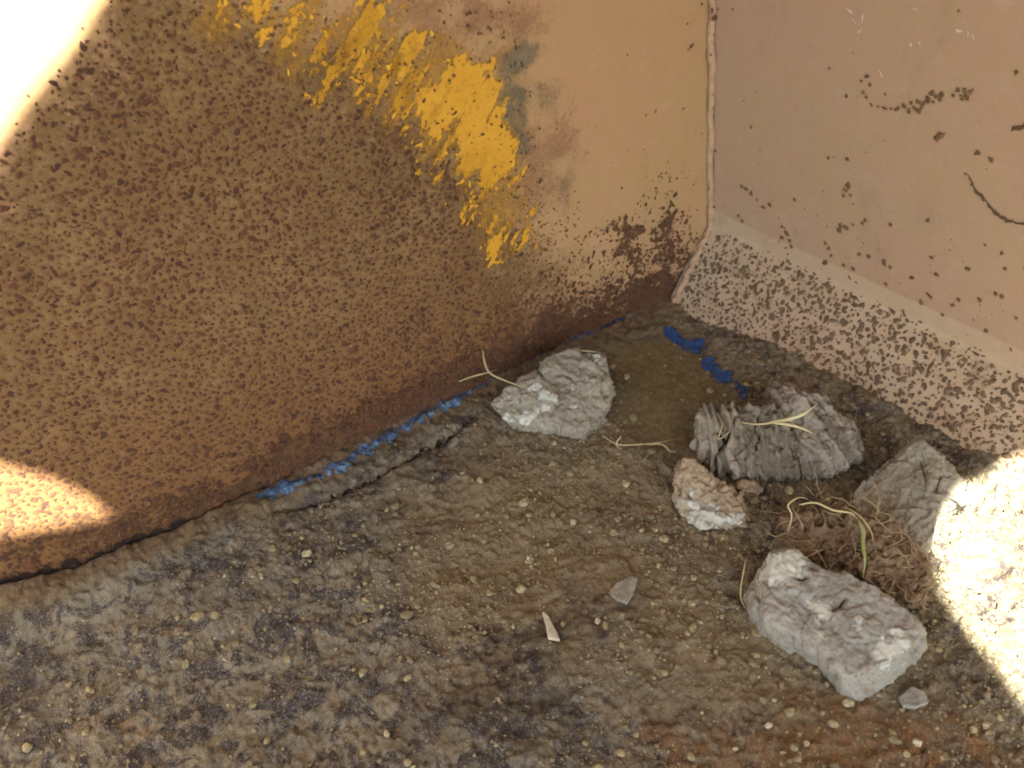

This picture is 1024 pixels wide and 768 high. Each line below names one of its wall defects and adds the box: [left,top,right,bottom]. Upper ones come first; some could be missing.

peeling [213,0,544,269]
leakage [268,0,571,243]
crack [277,413,479,513]